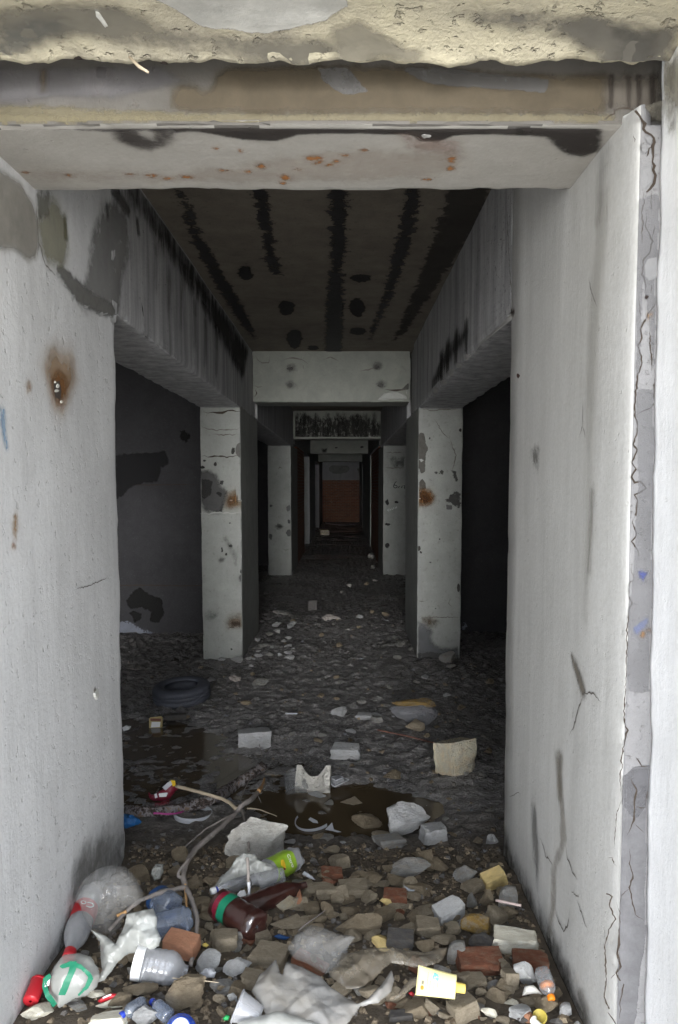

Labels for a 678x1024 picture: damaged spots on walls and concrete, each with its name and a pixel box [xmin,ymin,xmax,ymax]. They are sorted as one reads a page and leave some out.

peeling [159,0,347,33]
leakage [249,189,284,276]
leakage [287,188,424,352]
crack [606,107,657,233]
peeling [636,195,660,374]
corrosion [47,351,73,405]
corrosion [419,489,434,506]
peeling [418,433,461,510]
peeling [627,390,655,692]
crack [541,257,657,1024]